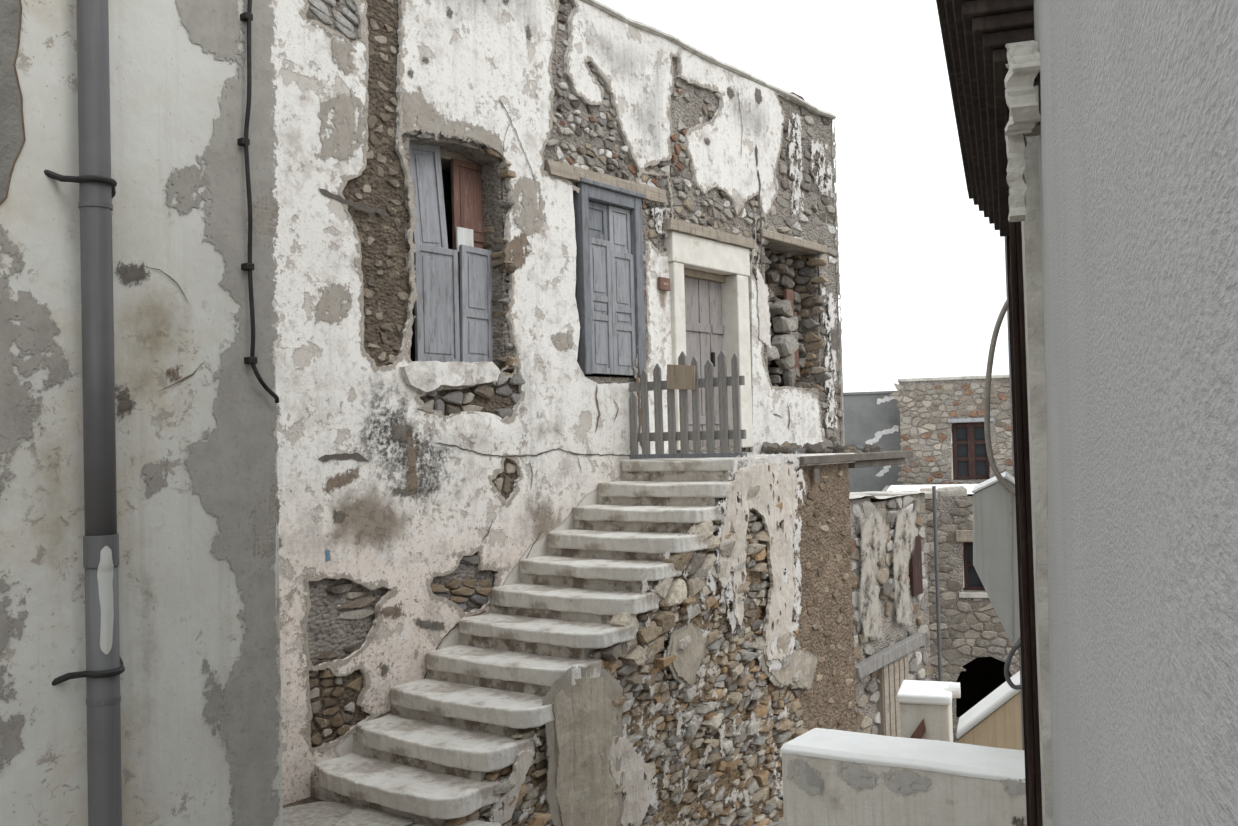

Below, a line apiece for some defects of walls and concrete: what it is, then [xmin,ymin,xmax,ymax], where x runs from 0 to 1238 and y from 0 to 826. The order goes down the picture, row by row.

peeling [0,0,26,205]
spalling [299,0,845,446]
peeling [0,571,31,769]
peeling [0,224,73,505]
peeling [162,0,284,826]
spalling [322,467,359,493]
spalling [301,569,397,755]
spalling [426,545,502,618]
spalling [488,452,523,508]
crack [433,374,642,490]
peeling [706,449,818,690]
peeling [530,721,562,826]